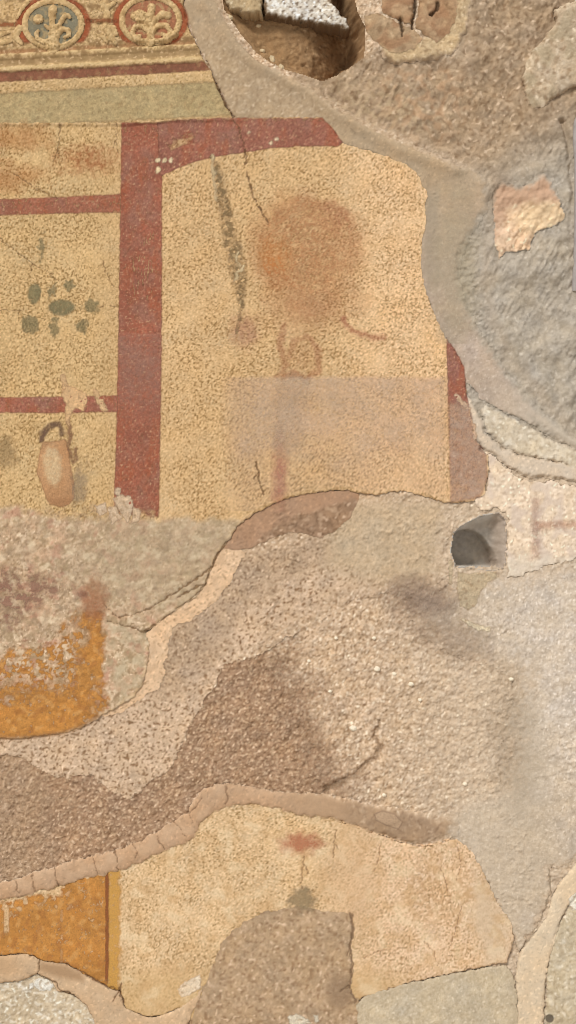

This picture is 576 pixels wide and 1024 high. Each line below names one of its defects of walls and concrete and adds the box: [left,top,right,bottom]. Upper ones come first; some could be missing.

spalling [223,0,365,81]
crack [399,1,439,33]
peeling [95,487,141,524]
crack [107,542,227,633]
spalling [449,512,507,584]
spalling [101,546,246,717]
spalling [0,653,336,883]